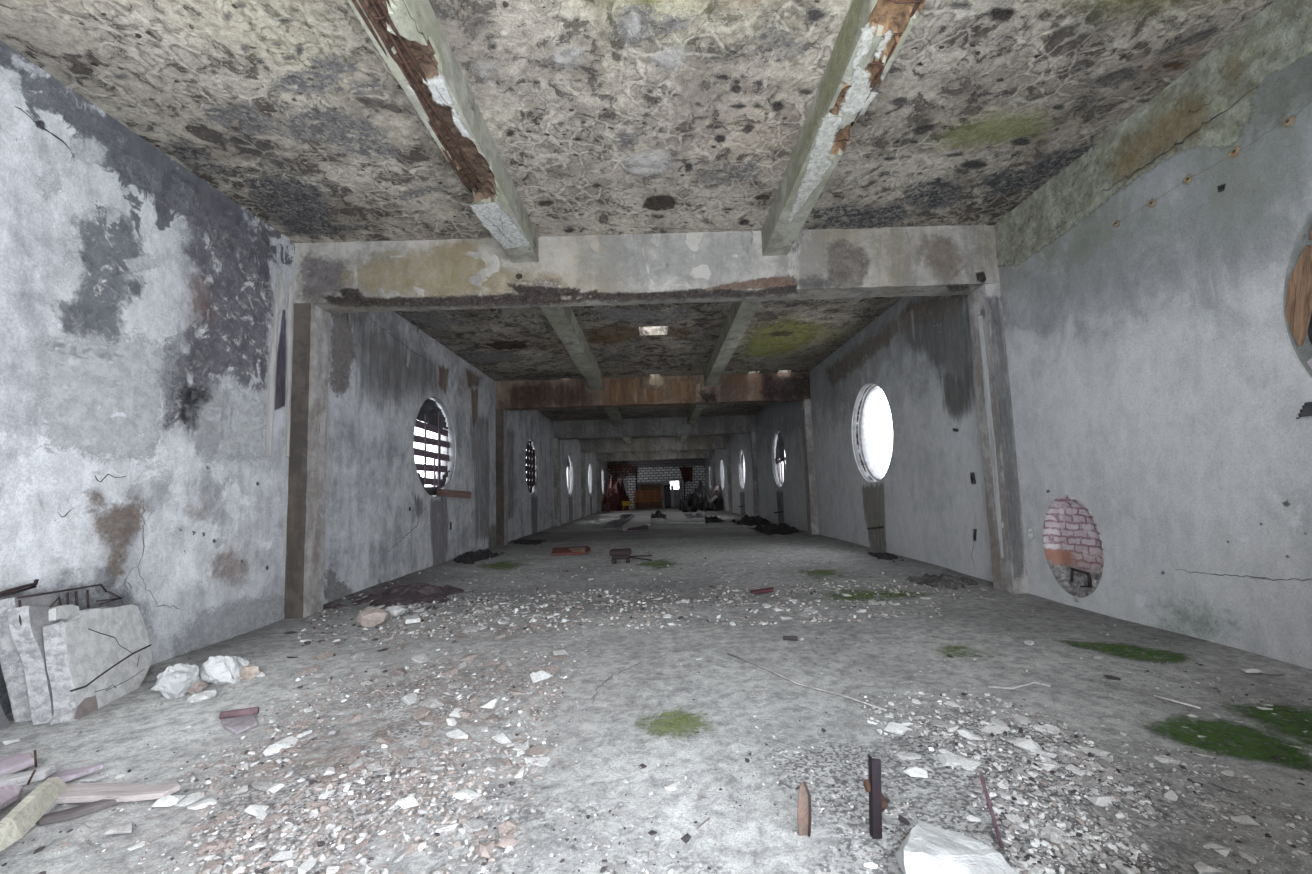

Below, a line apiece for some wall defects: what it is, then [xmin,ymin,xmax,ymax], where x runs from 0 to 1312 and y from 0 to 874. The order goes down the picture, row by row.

spalling [197,43,402,161]
spalling [352,0,530,249]
peeling [785,0,1312,292]
damp [60,211,147,344]
damp [152,182,345,457]
damp [762,374,811,401]
damp [826,295,1023,578]
spalling [1043,490,1104,602]
crack [1175,569,1312,581]